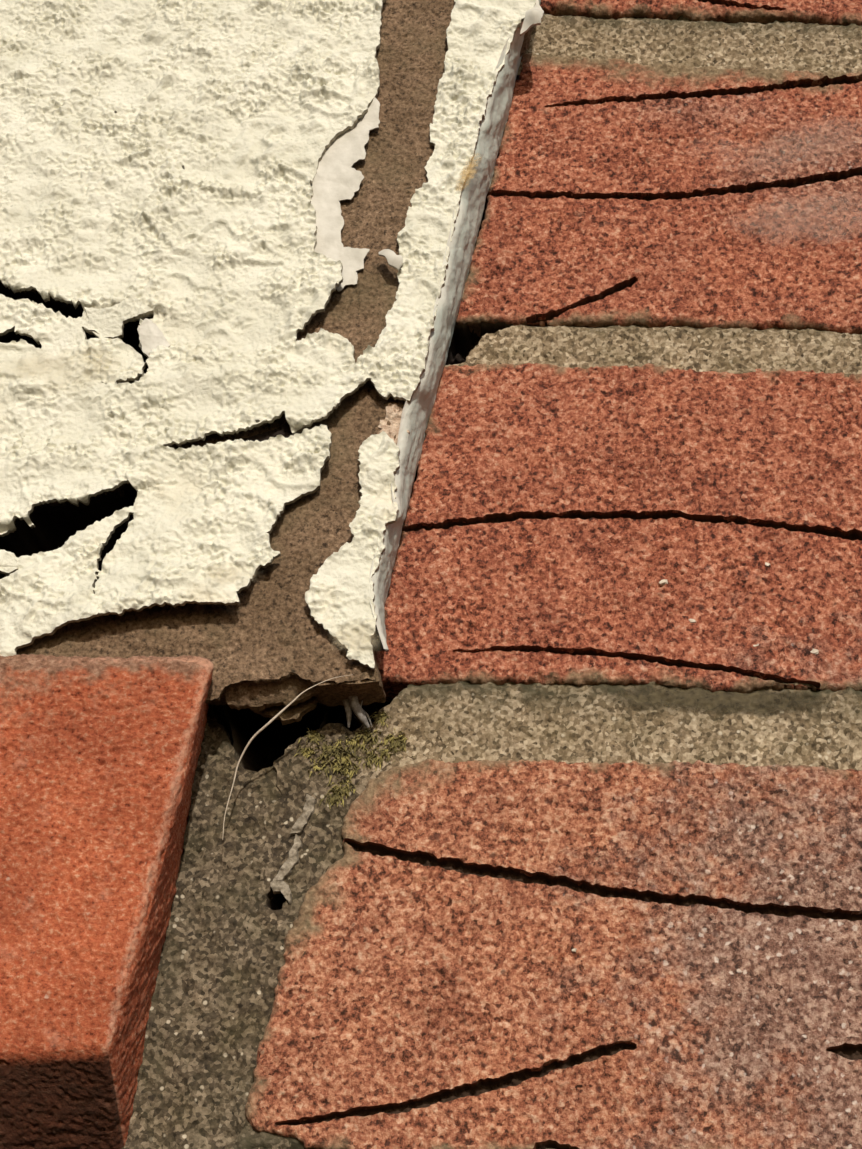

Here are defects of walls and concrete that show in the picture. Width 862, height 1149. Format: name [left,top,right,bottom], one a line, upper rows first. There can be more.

peeling [520,0,544,36]
crack [545,75,859,108]
peeling [297,0,455,363]
crack [486,167,862,201]
crack [0,282,170,383]
crack [525,275,636,327]
crack [0,483,137,588]
peeling [16,381,410,725]
crack [402,509,862,541]
crack [453,645,820,690]
crack [343,838,862,921]
crack [275,1042,637,1125]